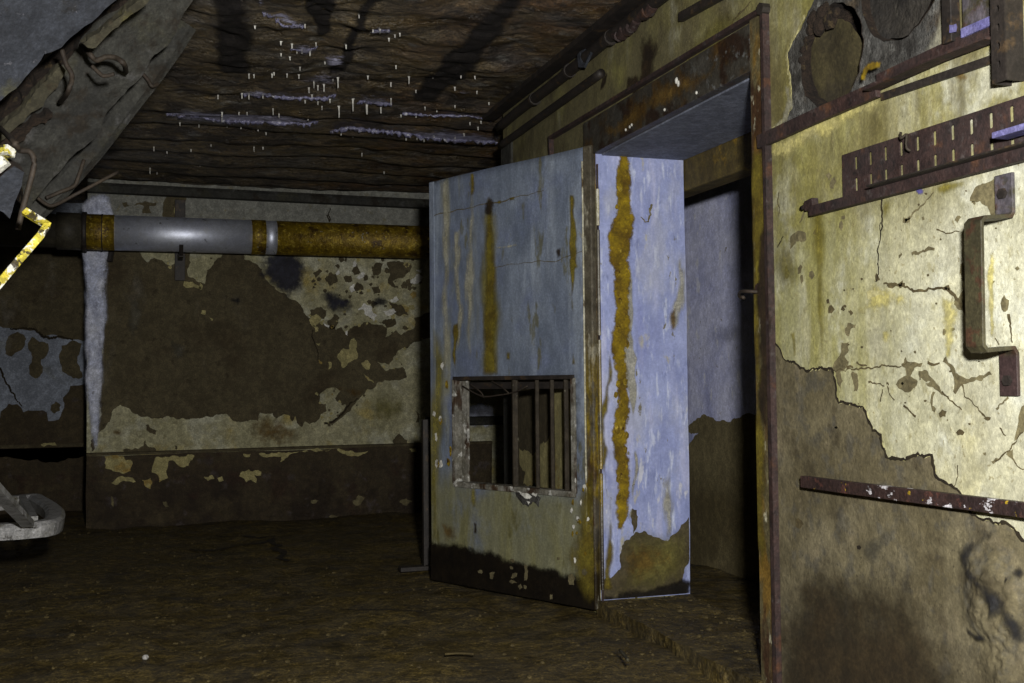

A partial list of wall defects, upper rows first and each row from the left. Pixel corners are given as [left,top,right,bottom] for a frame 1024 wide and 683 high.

efflorescence [166,111,318,128]
efflorescence [240,76,336,102]
corrosion [483,197,514,374]
corrosion [557,196,577,290]
crack [875,192,964,309]
peeling [0,246,430,462]
corrosion [570,156,635,597]
crack [834,361,940,372]
peeling [604,413,760,600]
peeling [775,299,1024,683]
damp [431,543,594,610]
damp [960,545,1021,639]